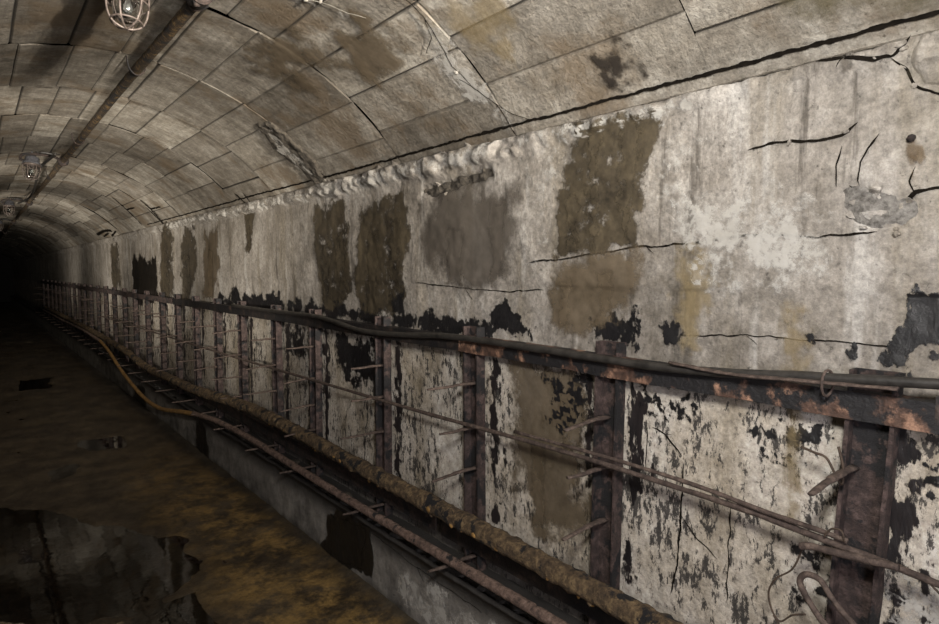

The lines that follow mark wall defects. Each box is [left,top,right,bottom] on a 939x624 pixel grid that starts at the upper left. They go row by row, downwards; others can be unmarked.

crack [96,0,939,237]
leakage [132,143,537,403]
leakage [322,329,375,440]
crack [417,282,541,299]
leakage [517,98,693,353]
crack [529,231,877,263]
leakage [664,182,832,293]
leakage [877,283,939,377]
leakage [626,382,698,511]
leakage [748,418,835,472]
leakage [320,509,374,578]
leakage [791,541,831,607]